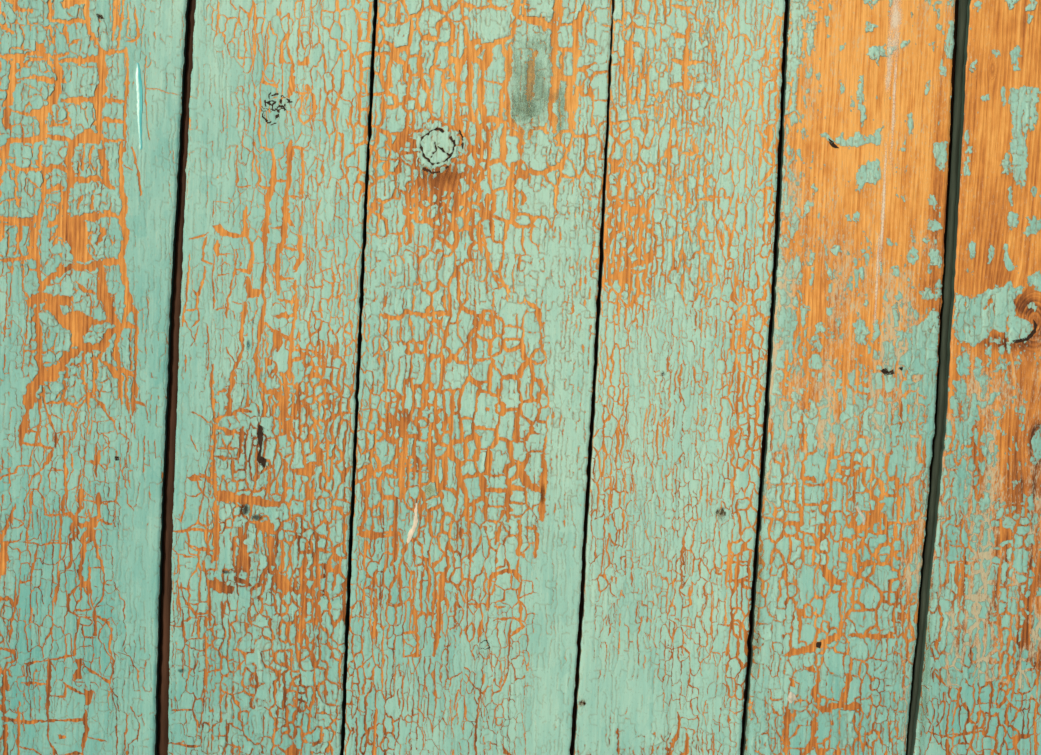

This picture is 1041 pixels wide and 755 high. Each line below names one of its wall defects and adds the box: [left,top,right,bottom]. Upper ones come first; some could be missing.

peeling [0,0,144,418]
crack [0,0,373,755]
peeling [185,0,728,755]
crack [345,0,784,755]
peeling [746,0,1041,755]
crack [914,687,1041,755]